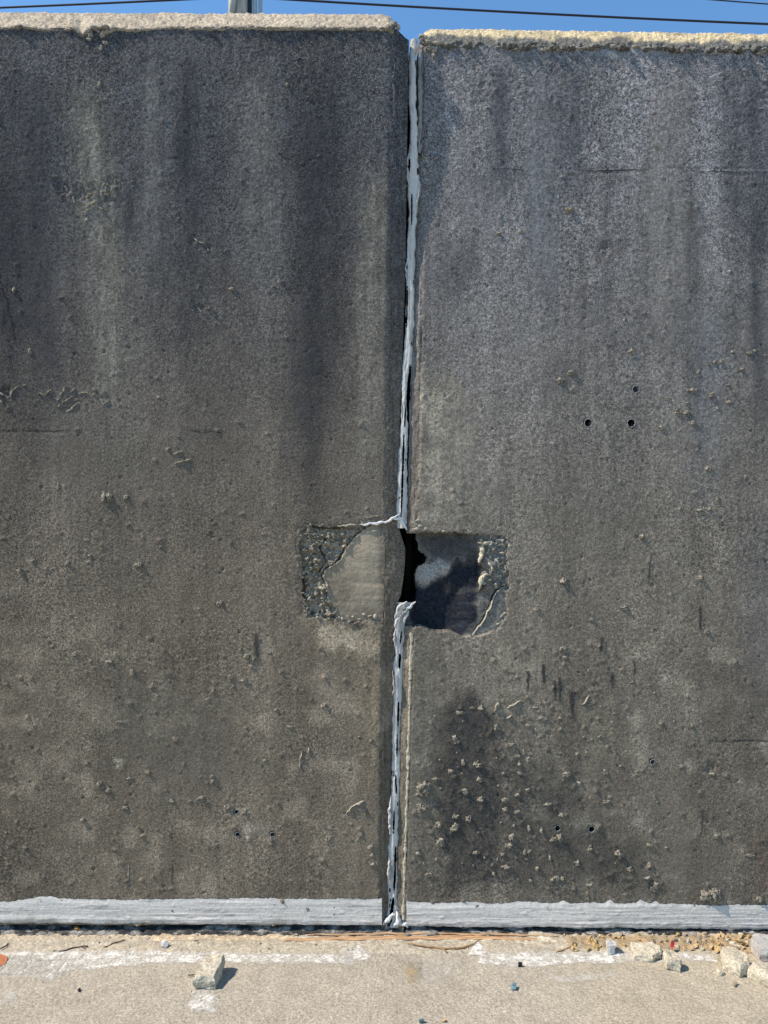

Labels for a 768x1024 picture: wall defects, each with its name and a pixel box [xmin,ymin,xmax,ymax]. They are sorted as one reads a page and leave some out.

spalling [293,517,386,629]
spalling [400,519,512,641]
leakage [527,665,575,716]
leakage [440,695,502,882]